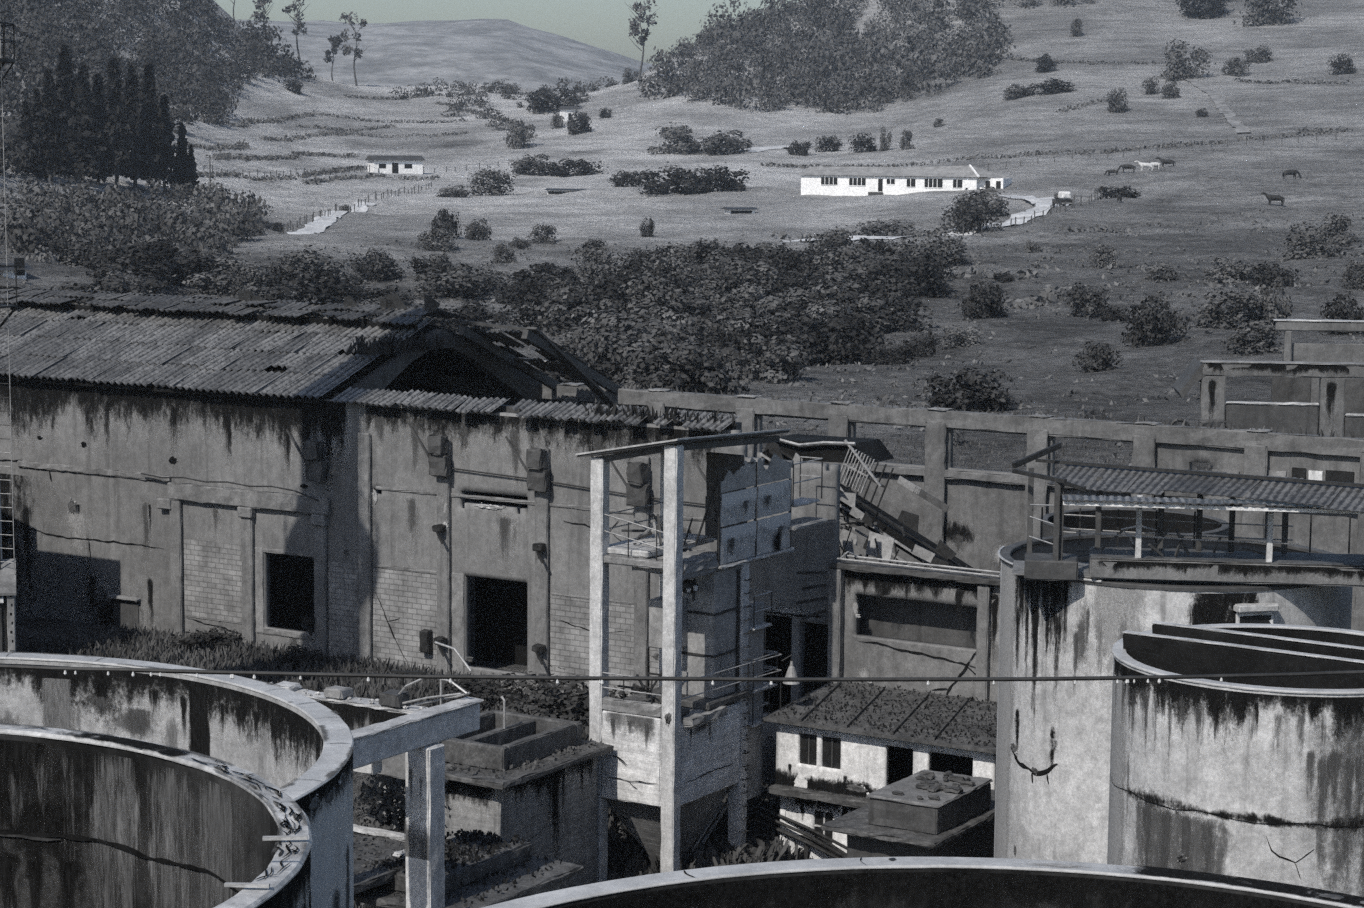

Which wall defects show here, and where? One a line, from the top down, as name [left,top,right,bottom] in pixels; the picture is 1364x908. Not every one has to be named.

leakage [0,379,346,462]
leakage [363,405,717,471]
leakage [0,663,323,766]
leakage [315,700,407,729]
leakage [563,560,1364,908]
leakage [0,739,244,908]
leakage [291,753,353,821]
leakage [404,826,429,861]
leakage [445,780,492,806]
leakage [509,758,593,844]
leakage [257,850,311,908]
leakage [334,848,350,908]